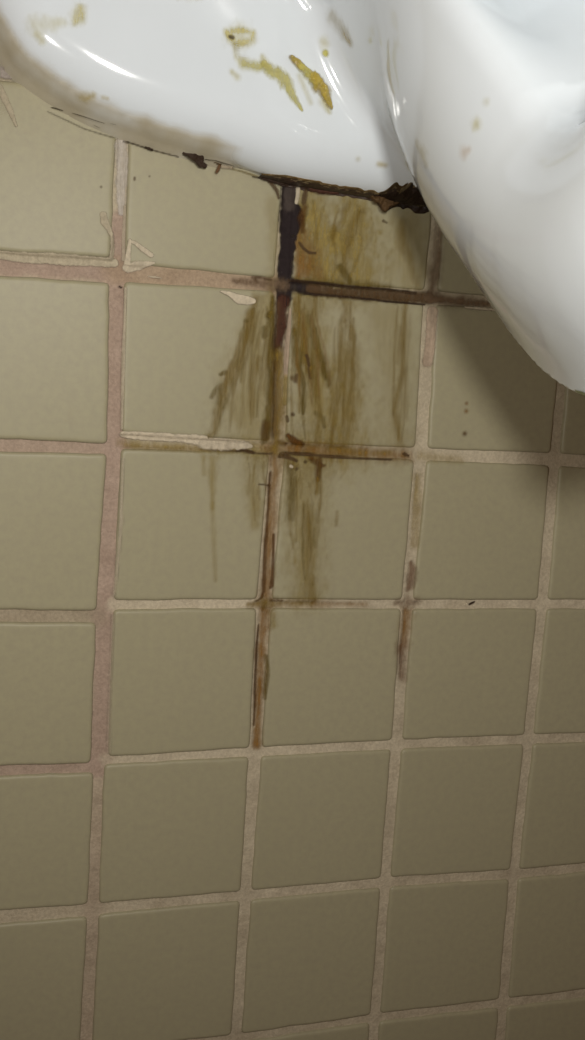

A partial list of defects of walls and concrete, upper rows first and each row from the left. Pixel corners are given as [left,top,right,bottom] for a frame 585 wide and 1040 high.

peeling [37,239,162,279]
rust [294,192,373,288]
leakage [234,182,490,453]
peeling [119,431,253,451]
rust [126,296,409,748]